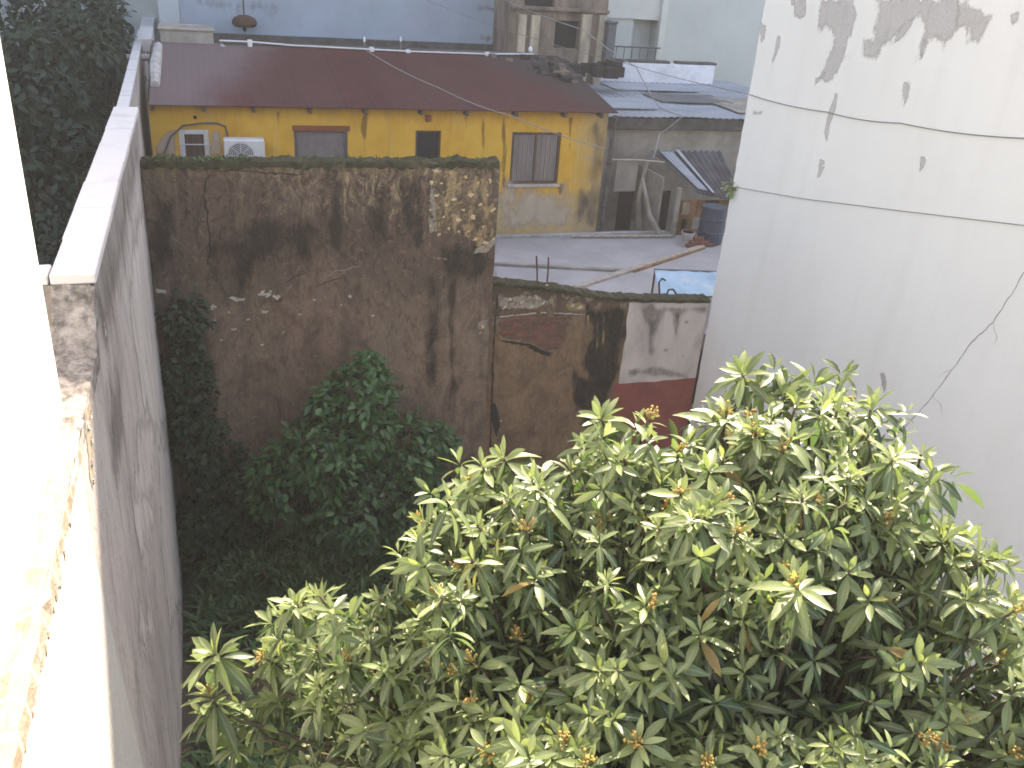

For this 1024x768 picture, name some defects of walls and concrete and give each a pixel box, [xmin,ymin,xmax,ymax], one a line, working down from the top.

crack [198,169,305,267]
peeling [428,168,571,254]
leakage [426,244,488,383]
spalling [478,295,587,356]
leakage [573,306,627,433]
crack [892,272,1024,442]